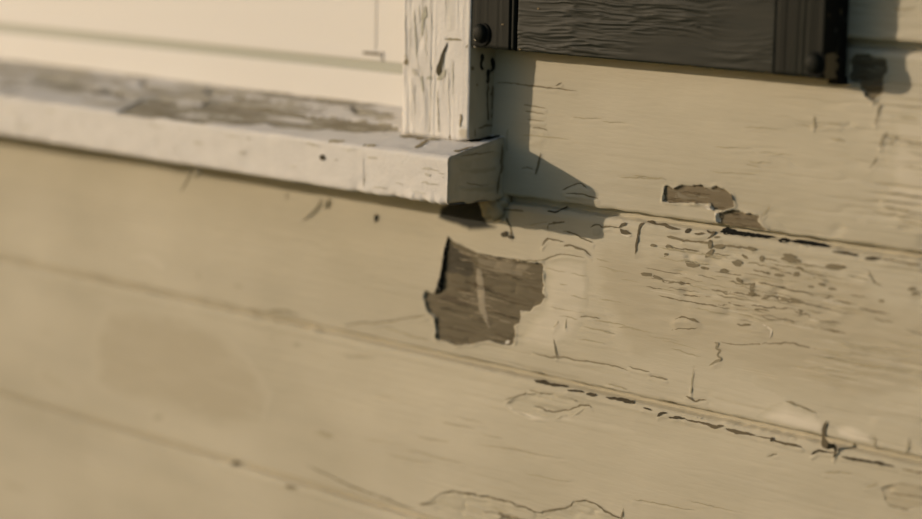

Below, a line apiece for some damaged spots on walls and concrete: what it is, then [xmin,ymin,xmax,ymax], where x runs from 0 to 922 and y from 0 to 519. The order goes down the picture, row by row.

peeling [849,54,888,101]
peeling [101,87,400,133]
peeling [457,126,468,140]
peeling [663,185,766,230]
crack [404,0,922,510]
peeling [425,238,545,346]